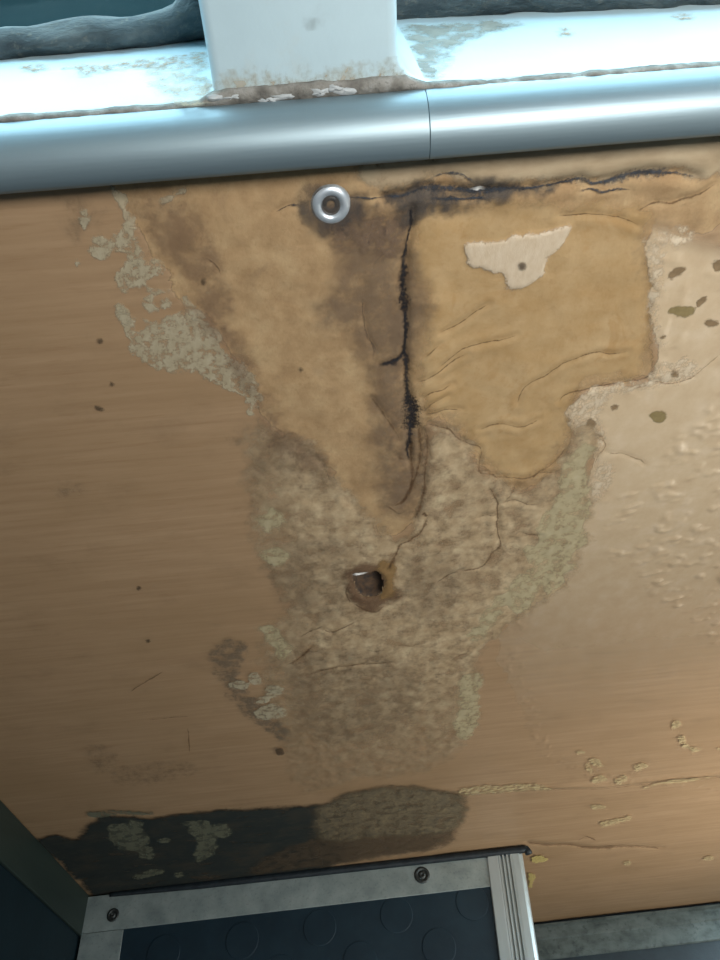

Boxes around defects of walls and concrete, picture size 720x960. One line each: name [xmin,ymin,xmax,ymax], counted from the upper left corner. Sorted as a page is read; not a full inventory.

peeling [89,186,263,416]
damp [300,177,553,509]
peeling [464,226,571,289]
crack [351,168,709,567]
peeling [566,379,659,451]
peeling [649,411,666,423]
peeling [648,227,691,339]
peeling [668,296,707,318]
damp [229,672,286,720]
damp [38,788,465,896]